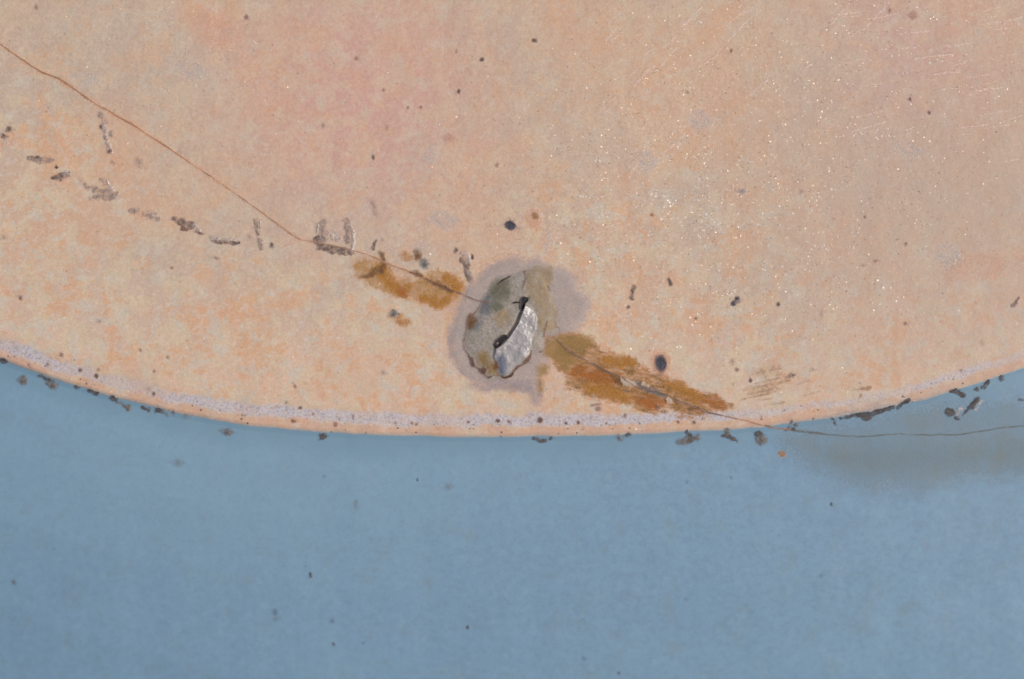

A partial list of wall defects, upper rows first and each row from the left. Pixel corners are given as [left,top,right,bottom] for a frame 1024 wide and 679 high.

corrosion [353,248,463,309]
crack [0,44,1019,437]
corrosion [537,331,734,419]